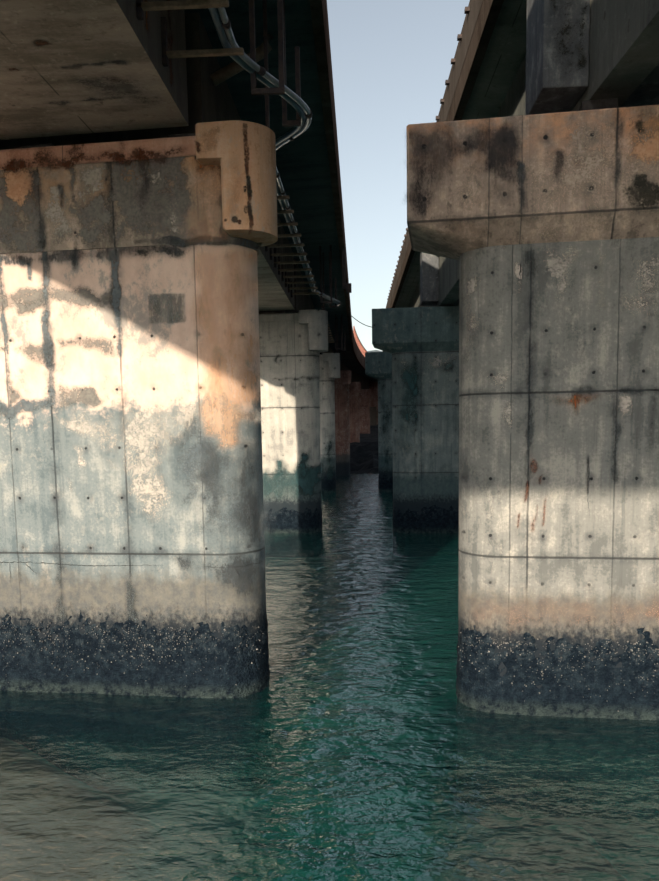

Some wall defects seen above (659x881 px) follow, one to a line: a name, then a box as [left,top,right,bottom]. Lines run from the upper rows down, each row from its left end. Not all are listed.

rust [2,143,182,172]
water stain [409,130,452,213]
water stain [468,127,605,214]
water stain [625,120,659,210]
water stain [0,156,262,419]
water stain [61,404,334,542]
water stain [127,583,136,621]
water stain [208,556,256,596]